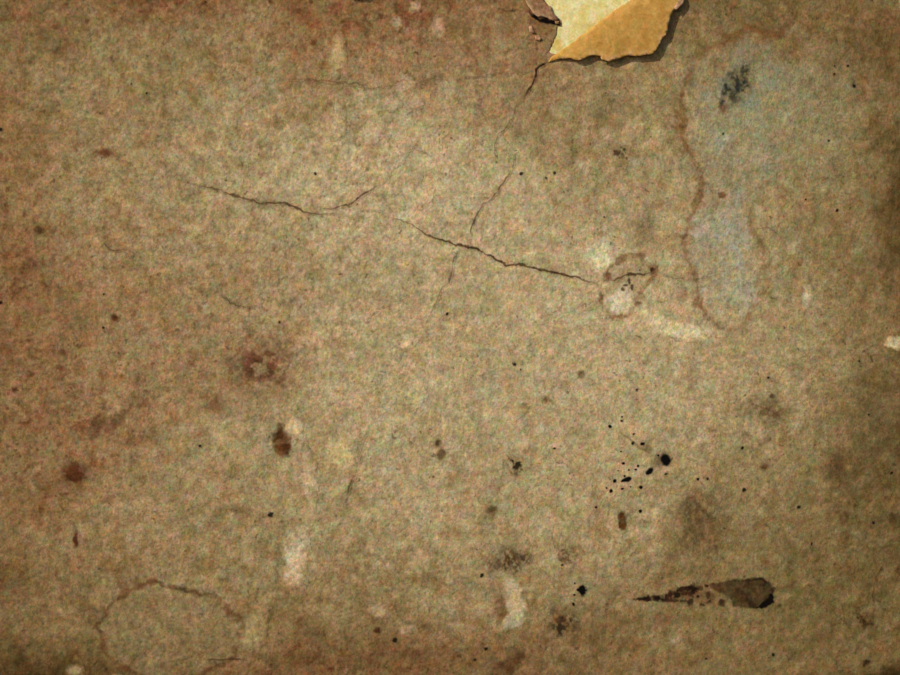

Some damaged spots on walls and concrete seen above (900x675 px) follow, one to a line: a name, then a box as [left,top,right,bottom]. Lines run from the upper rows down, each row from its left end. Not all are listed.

peeling [495,0,685,62]
crack [183,61,713,322]
leakage [594,7,870,339]
leakage [90,572,250,675]
crack [203,657,255,669]